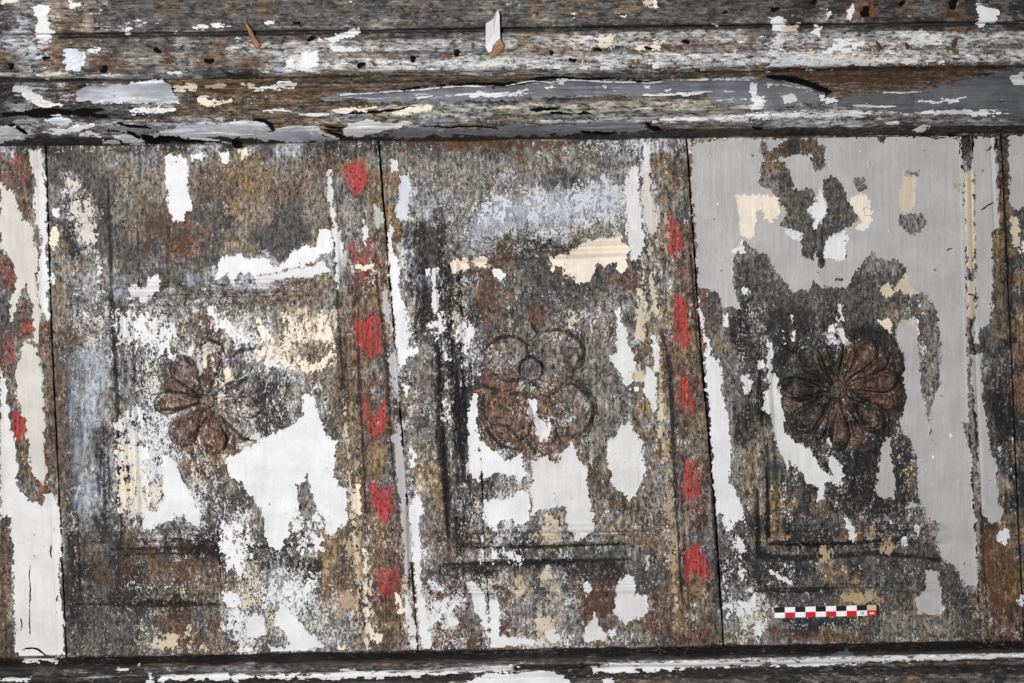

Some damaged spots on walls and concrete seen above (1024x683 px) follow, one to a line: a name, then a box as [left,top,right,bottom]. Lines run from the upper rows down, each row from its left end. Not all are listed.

peeling [4,3,1024,222]
crack [766,75,833,94]
peeling [0,125,103,664]
peeling [111,274,337,410]
peeling [215,169,374,290]
peeling [362,159,506,402]
peeling [466,144,681,643]
peeling [690,125,1024,641]
peeling [200,394,383,652]
peeling [391,425,561,649]
peeling [116,624,571,683]
peeling [591,649,1024,683]